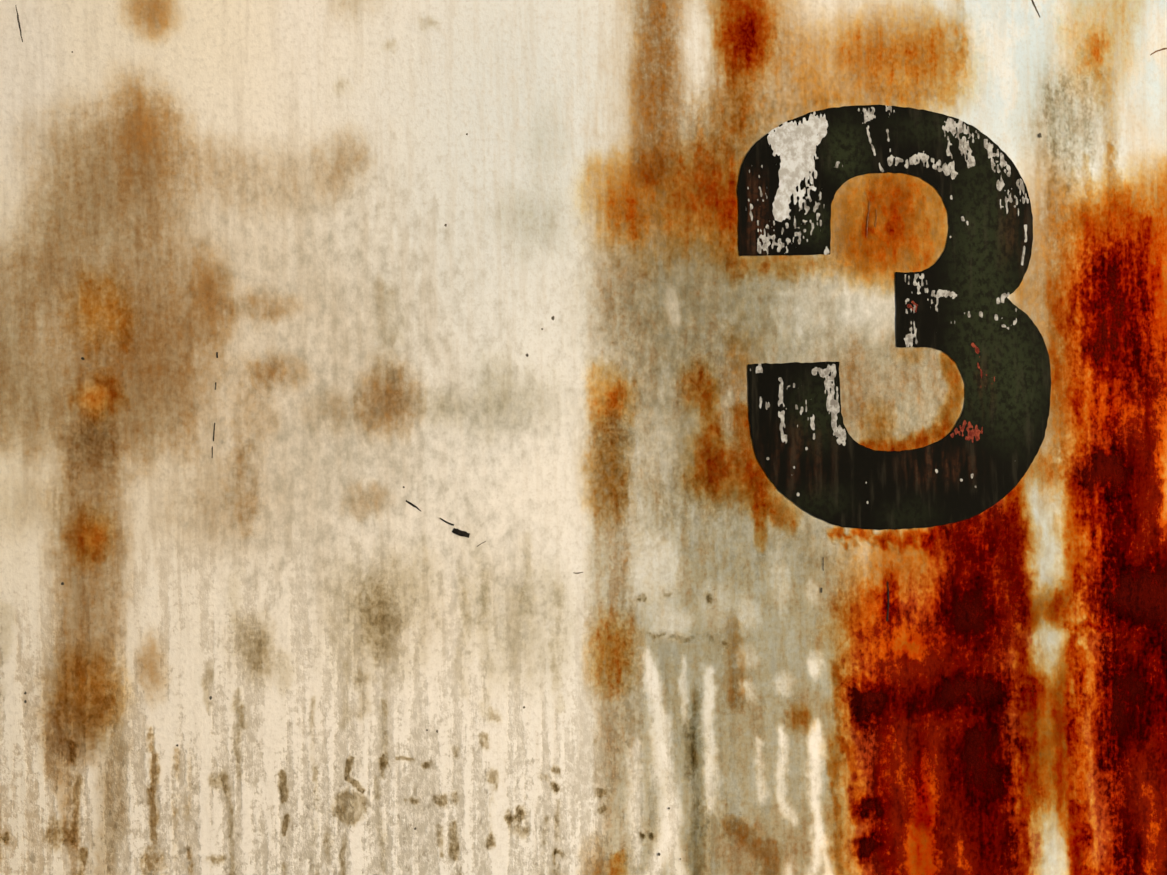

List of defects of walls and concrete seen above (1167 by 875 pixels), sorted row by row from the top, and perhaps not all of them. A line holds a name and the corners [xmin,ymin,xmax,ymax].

rust [724,0,765,67]
rust [113,109,160,214]
rust [668,161,739,230]
peeling [747,111,828,254]
rust [841,177,946,272]
peeling [858,105,1029,266]
peeling [904,274,957,347]
peeling [954,292,1017,330]
rust [78,311,184,413]
peeling [759,377,815,450]
peeling [812,364,846,446]
rust [828,205,1167,875]